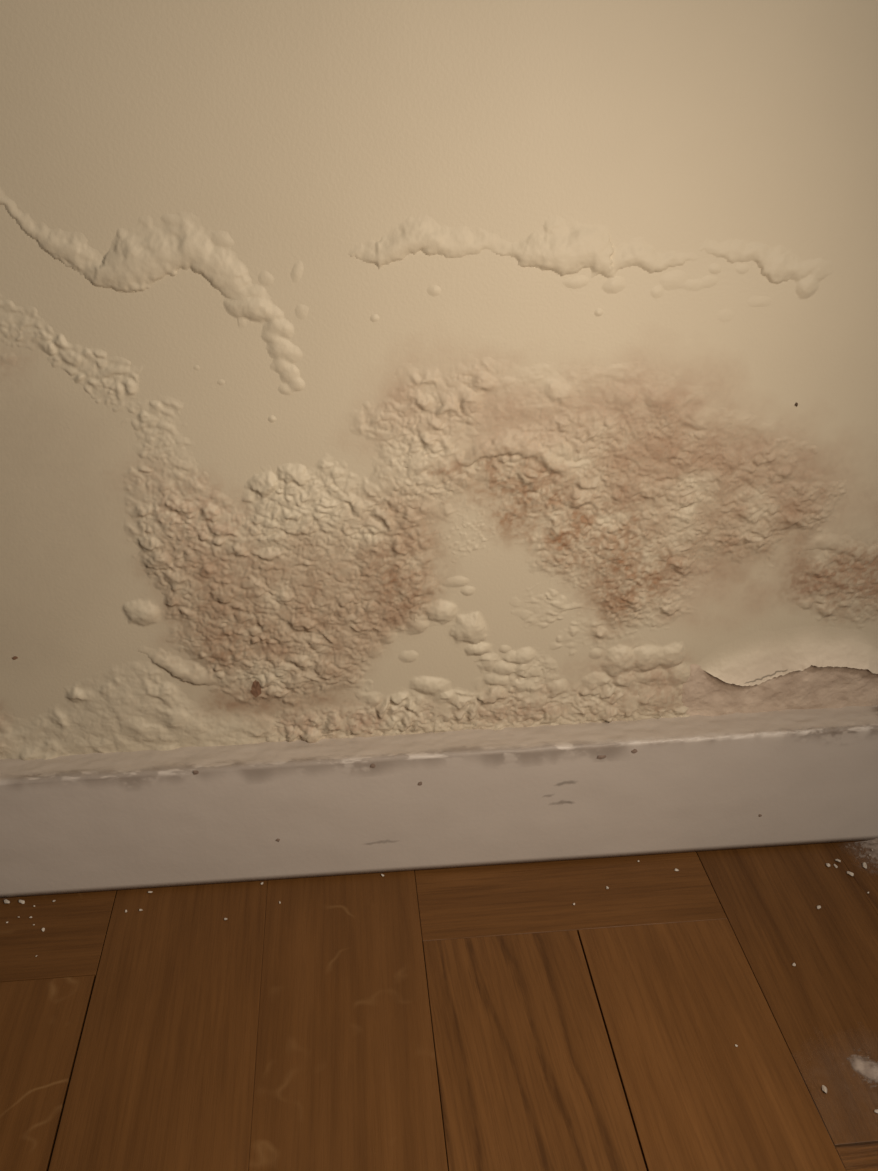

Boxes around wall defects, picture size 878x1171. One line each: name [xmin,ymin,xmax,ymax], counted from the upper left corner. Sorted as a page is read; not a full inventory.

peeling [682,626,878,716]